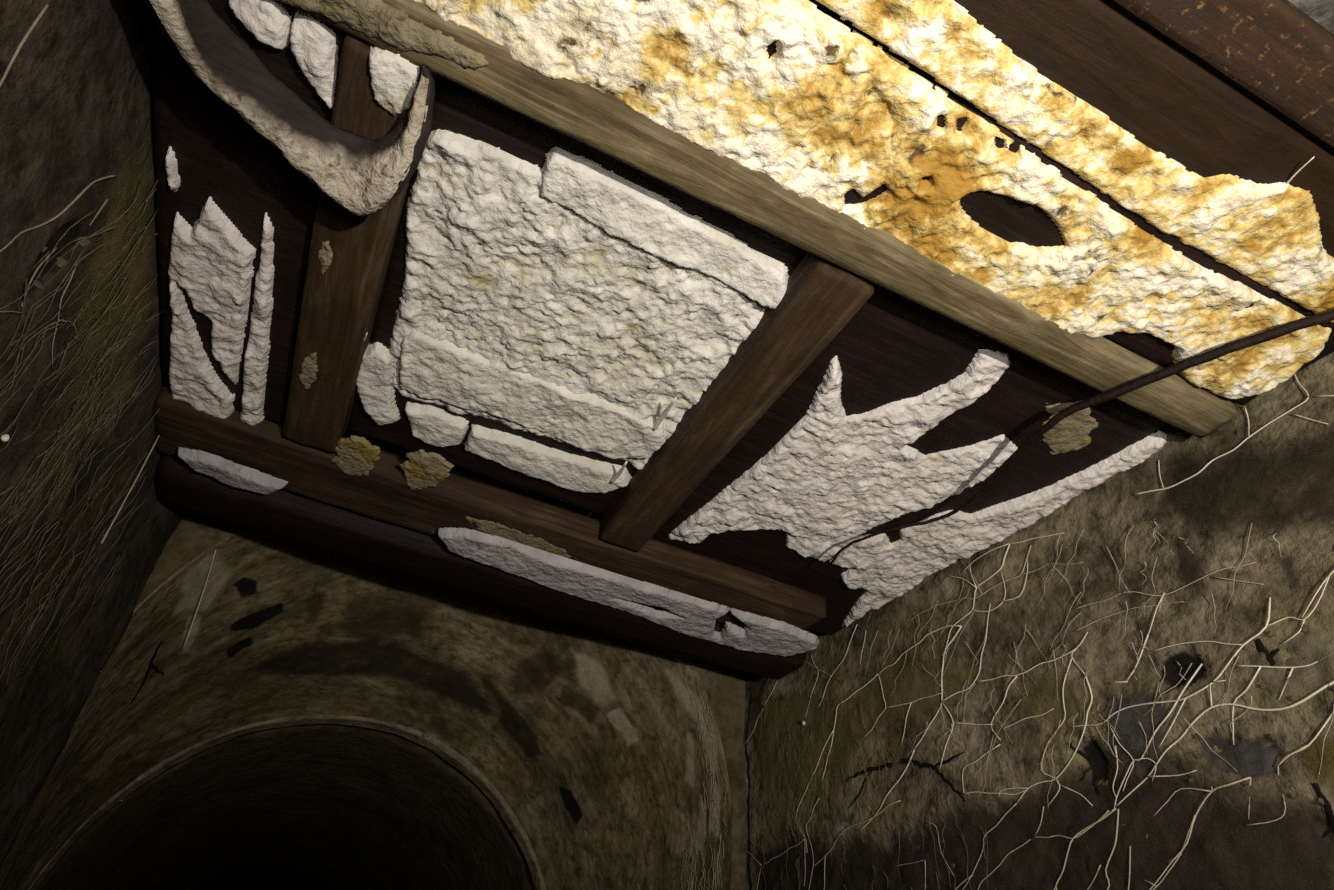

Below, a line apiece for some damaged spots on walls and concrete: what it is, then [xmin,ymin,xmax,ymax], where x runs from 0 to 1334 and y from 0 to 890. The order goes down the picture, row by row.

damp [1040,400,1099,456]
damp [331,435,381,476]
damp [399,449,454,490]
damp [465,516,577,559]
crack [1255,638,1280,666]
crack [844,752,966,809]
crack [1070,744,1100,795]
crack [1312,783,1334,838]